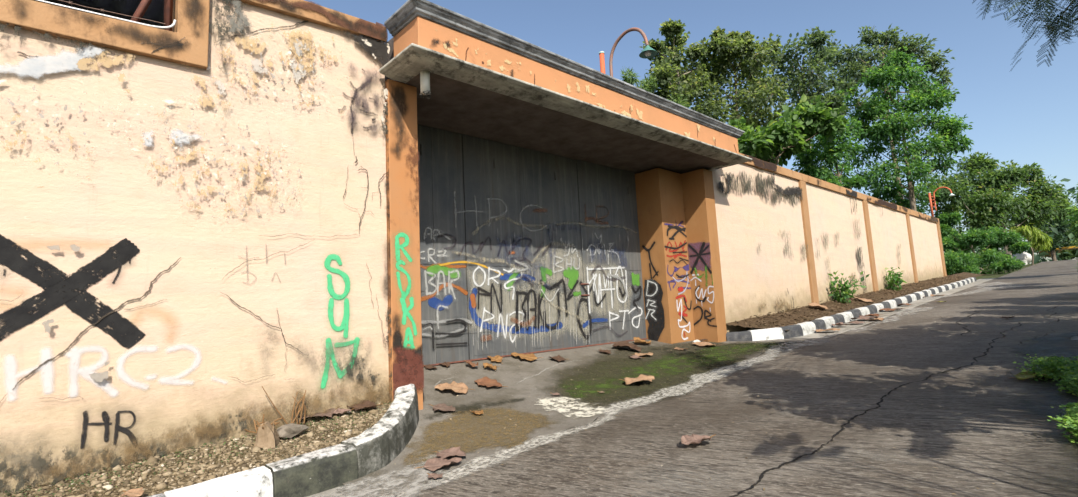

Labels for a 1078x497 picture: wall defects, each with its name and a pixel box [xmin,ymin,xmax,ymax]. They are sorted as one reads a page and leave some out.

damp [0,3,59,39]
peeling [0,29,343,219]
crack [222,69,388,382]
damp [719,171,802,204]
crack [0,257,181,402]
crack [730,305,1060,497]